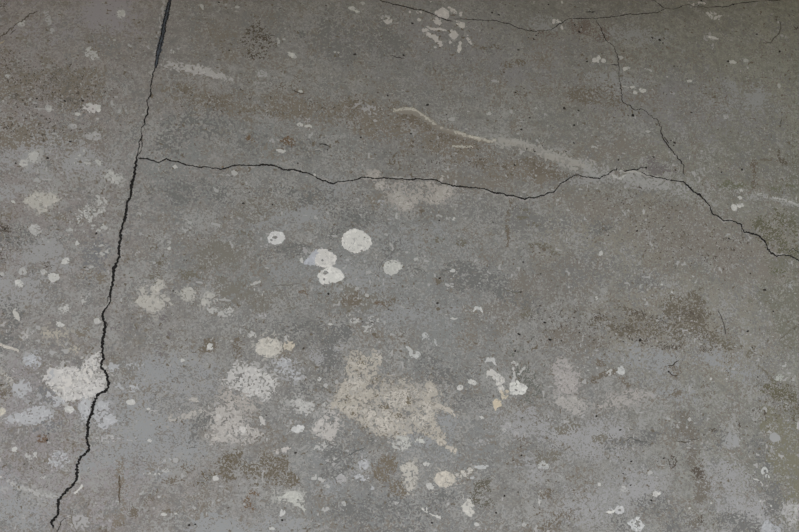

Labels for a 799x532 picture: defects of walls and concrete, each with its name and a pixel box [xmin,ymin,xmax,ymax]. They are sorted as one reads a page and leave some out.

crack [380,0,451,21]
crack [460,0,799,261]
crack [50,67,617,532]